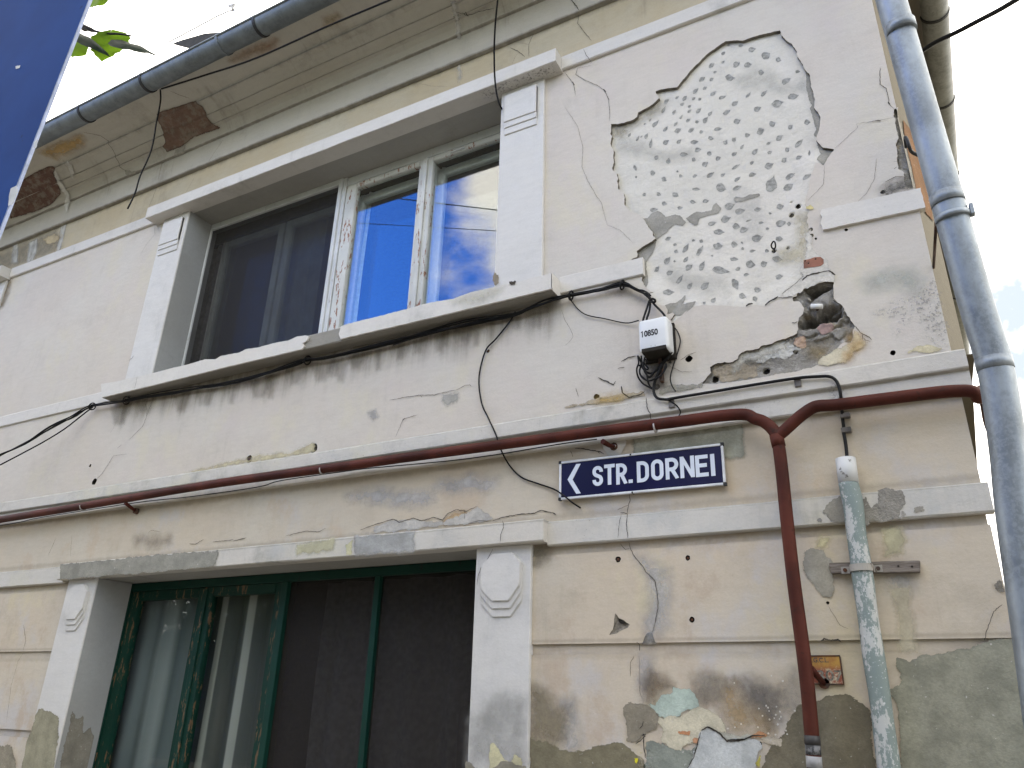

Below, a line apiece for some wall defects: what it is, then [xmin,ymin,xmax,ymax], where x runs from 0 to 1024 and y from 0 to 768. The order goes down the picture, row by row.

flaking render [158,101,220,156]
flaking render [8,166,61,219]
flaking render [612,33,866,395]
peeling [817,496,845,522]
peeling [60,550,218,580]
crack [618,494,659,758]
peeling [0,708,94,768]
damp [640,660,669,697]
peeling [623,687,807,768]
damp [699,678,778,728]
peeling [816,694,876,768]
peeling [890,638,1024,768]